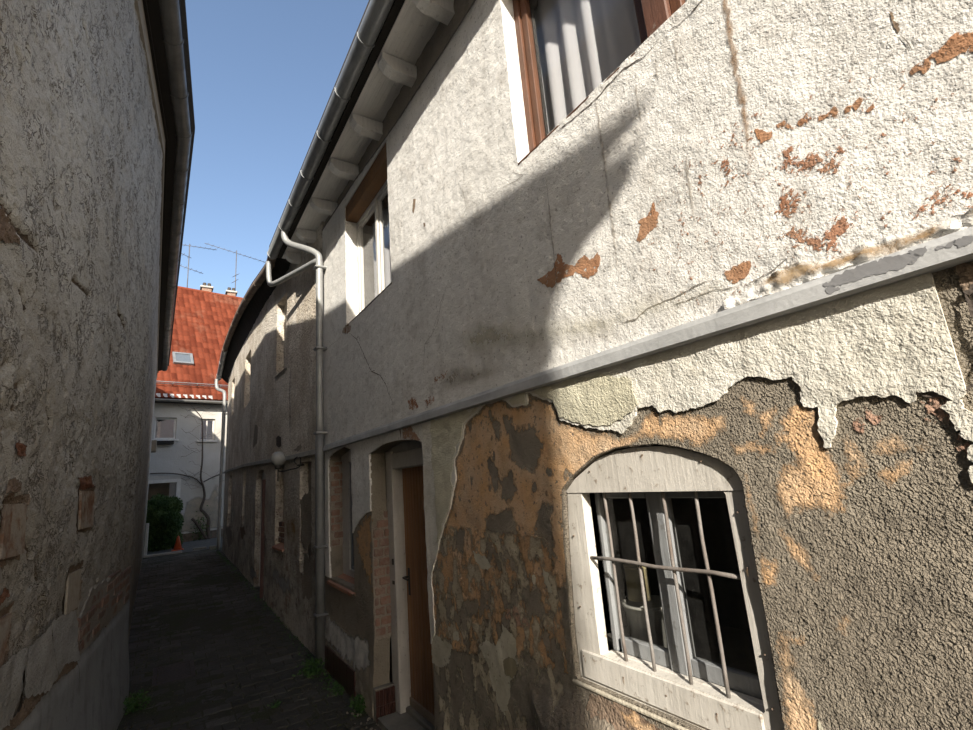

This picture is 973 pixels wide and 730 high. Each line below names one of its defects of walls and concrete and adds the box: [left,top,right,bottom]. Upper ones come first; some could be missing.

peeling [899,32,973,89]
peeling [637,78,973,301]
spalling [0,204,21,244]
peeling [537,252,600,288]
leakage [768,227,935,283]
spalling [0,478,31,531]
spalling [76,475,96,534]
spalling [431,263,973,730]
flaking render [0,560,131,730]
spalling [325,510,392,721]